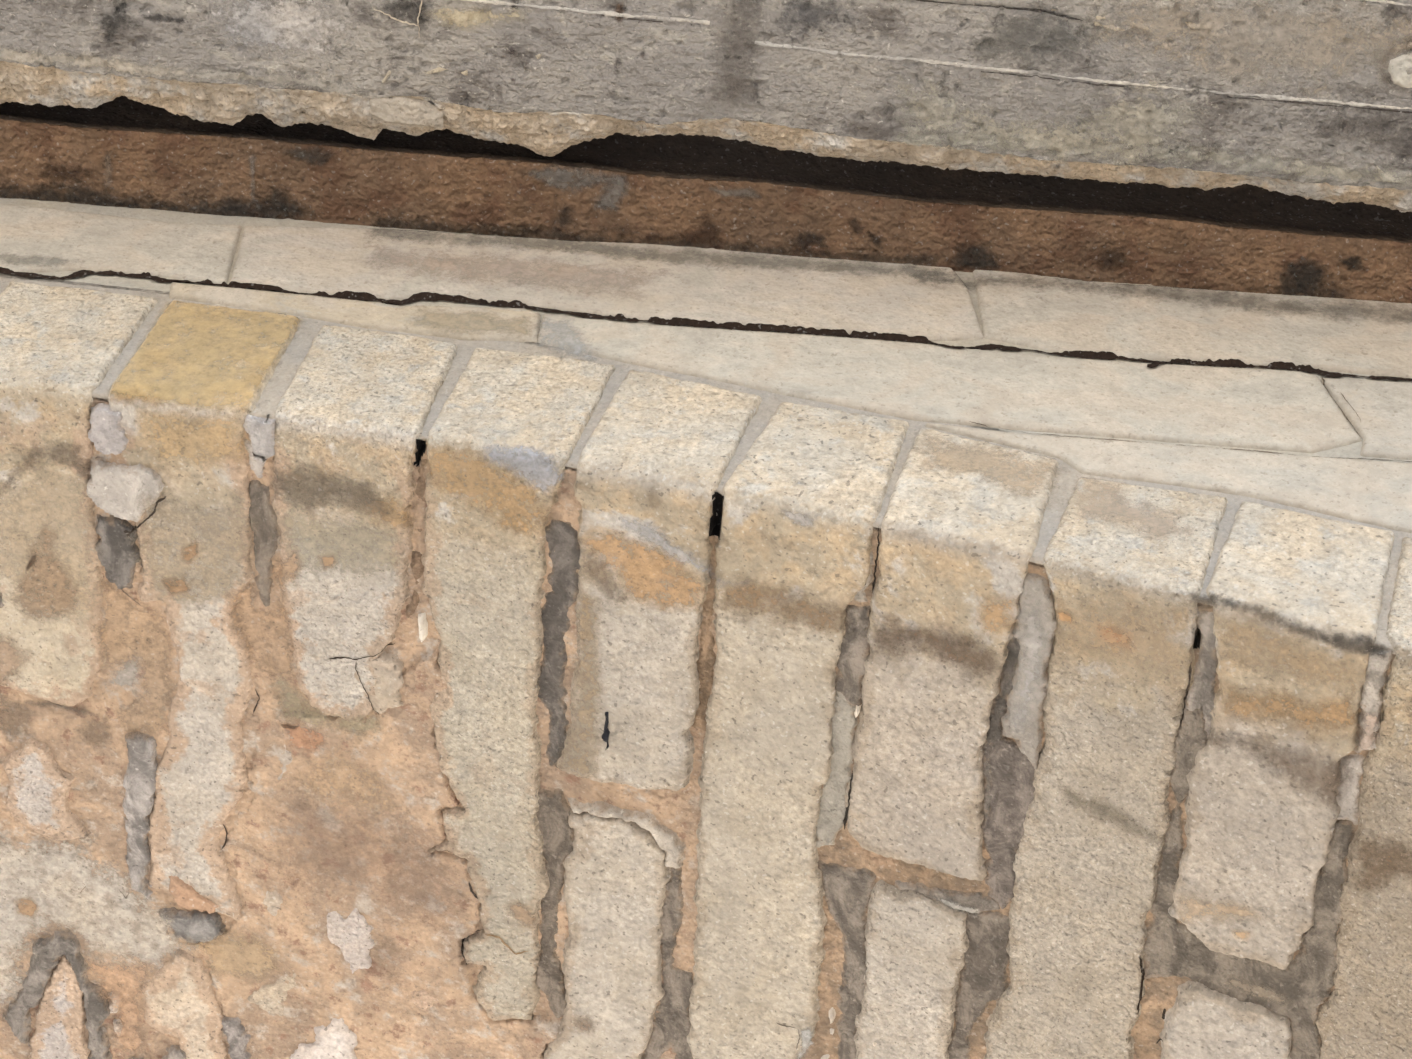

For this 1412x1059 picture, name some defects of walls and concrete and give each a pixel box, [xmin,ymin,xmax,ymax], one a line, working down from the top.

spalling [0,61,1412,213]
crack [0,267,1412,462]
crack [329,643,395,713]